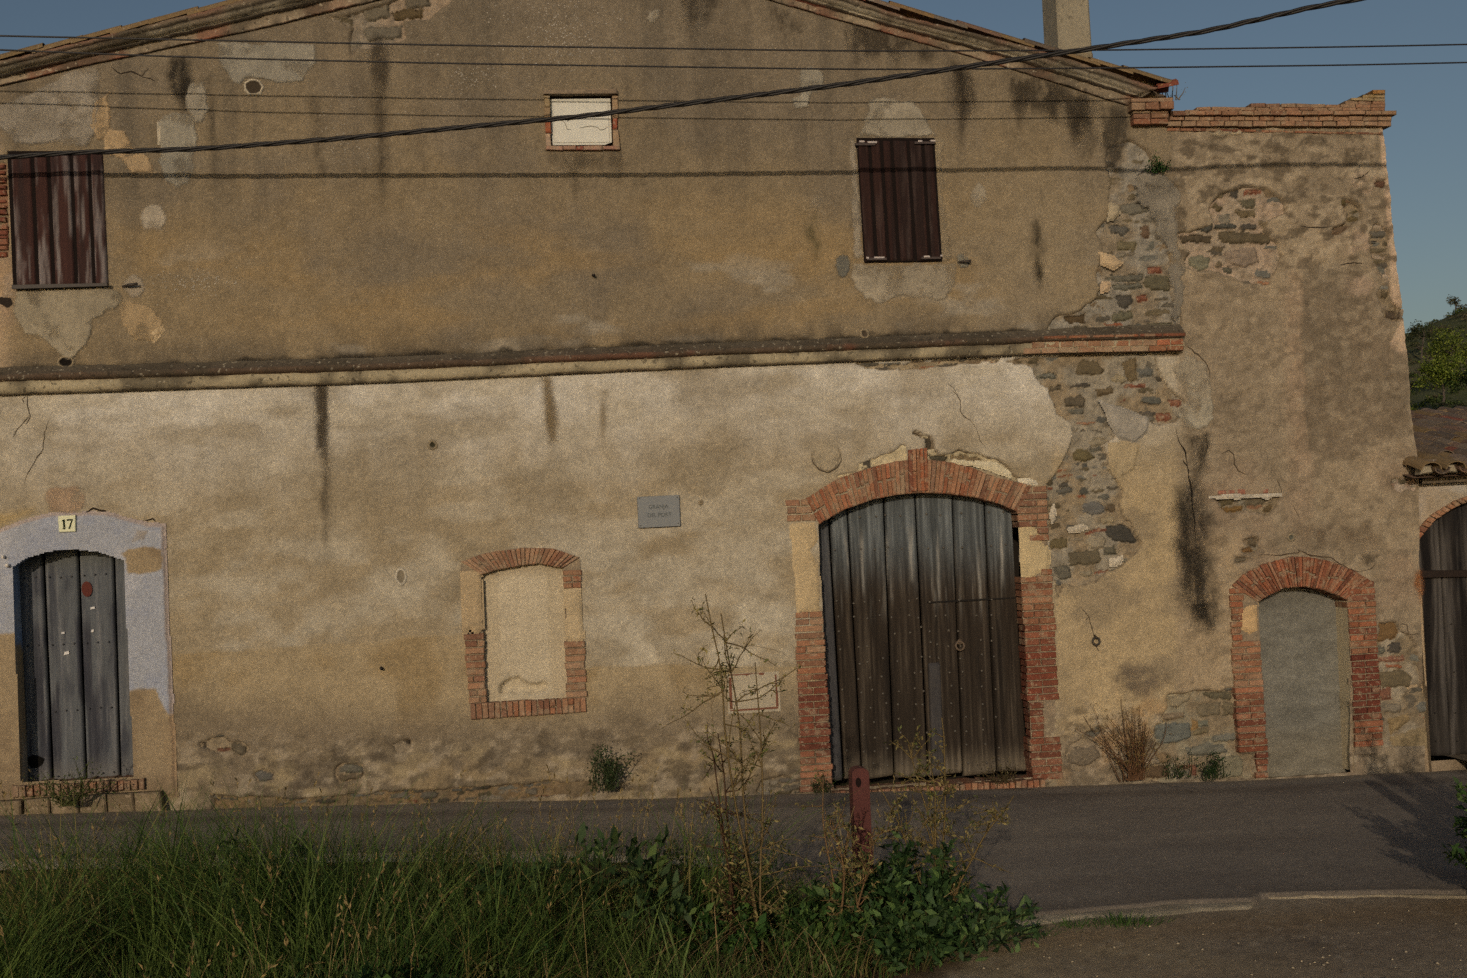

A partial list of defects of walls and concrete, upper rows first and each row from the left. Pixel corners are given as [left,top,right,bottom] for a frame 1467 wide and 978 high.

peeling [218,42,316,96]
peeling [90,84,209,186]
damp [1011,77,1124,164]
spalling [0,163,9,258]
peeling [141,205,166,228]
spalling [1048,141,1284,329]
spalling [1331,200,1404,321]
peeling [120,275,165,343]
damp [316,385,326,454]
spalling [837,352,1214,597]
damp [1179,494,1215,621]
spalling [1143,687,1253,783]